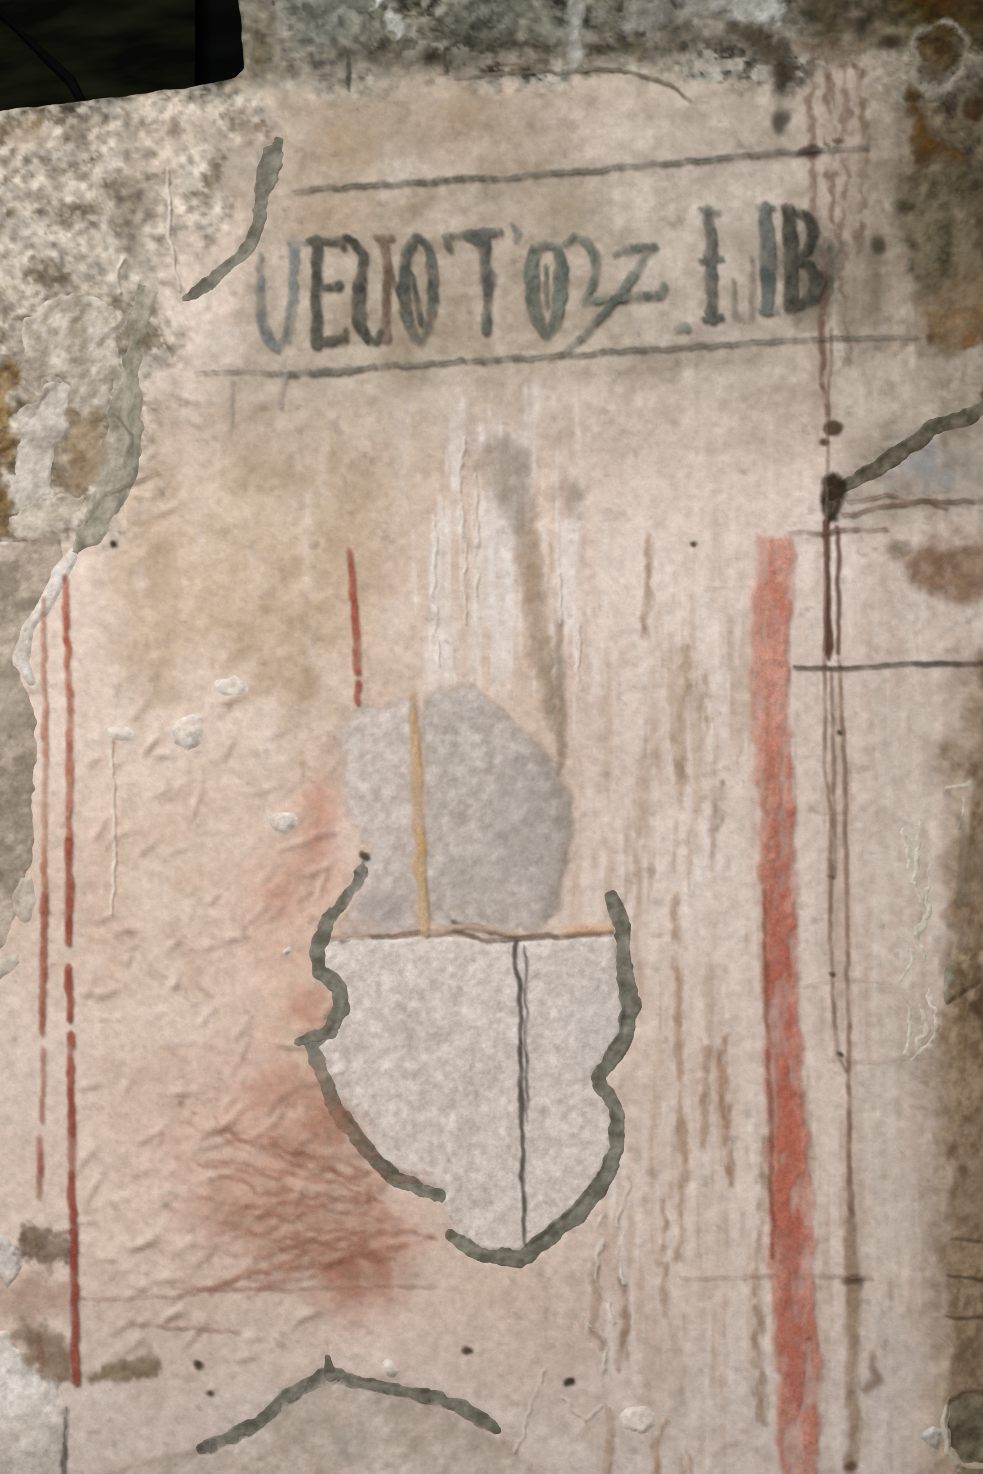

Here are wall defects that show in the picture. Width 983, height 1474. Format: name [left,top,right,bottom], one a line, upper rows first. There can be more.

rust [906,90,964,168]
rust [819,269,842,444]
rust [927,280,983,348]
peeling [0,293,120,979]
leakage [492,449,564,763]
rust [821,472,845,660]
leakage [893,544,983,601]
leakage [942,754,983,1394]
peeling [0,1233,25,1288]
spalling [920,1392,983,1474]